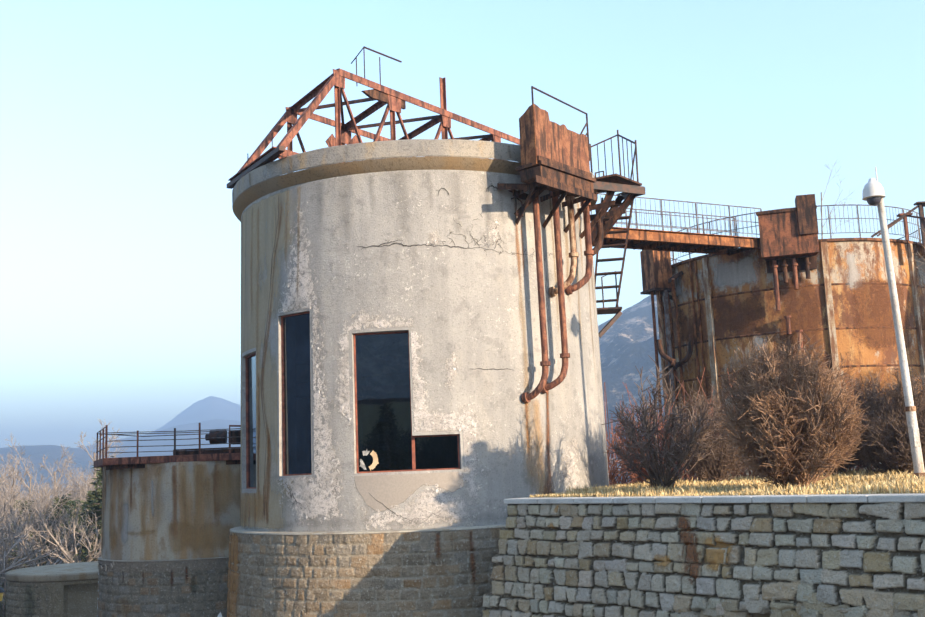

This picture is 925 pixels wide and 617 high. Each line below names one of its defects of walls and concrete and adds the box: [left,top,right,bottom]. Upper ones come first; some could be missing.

crack [357,213,551,263]
rust [227,191,292,617]
peeling [277,201,483,530]
rust [778,276,829,376]
rust [853,279,912,350]